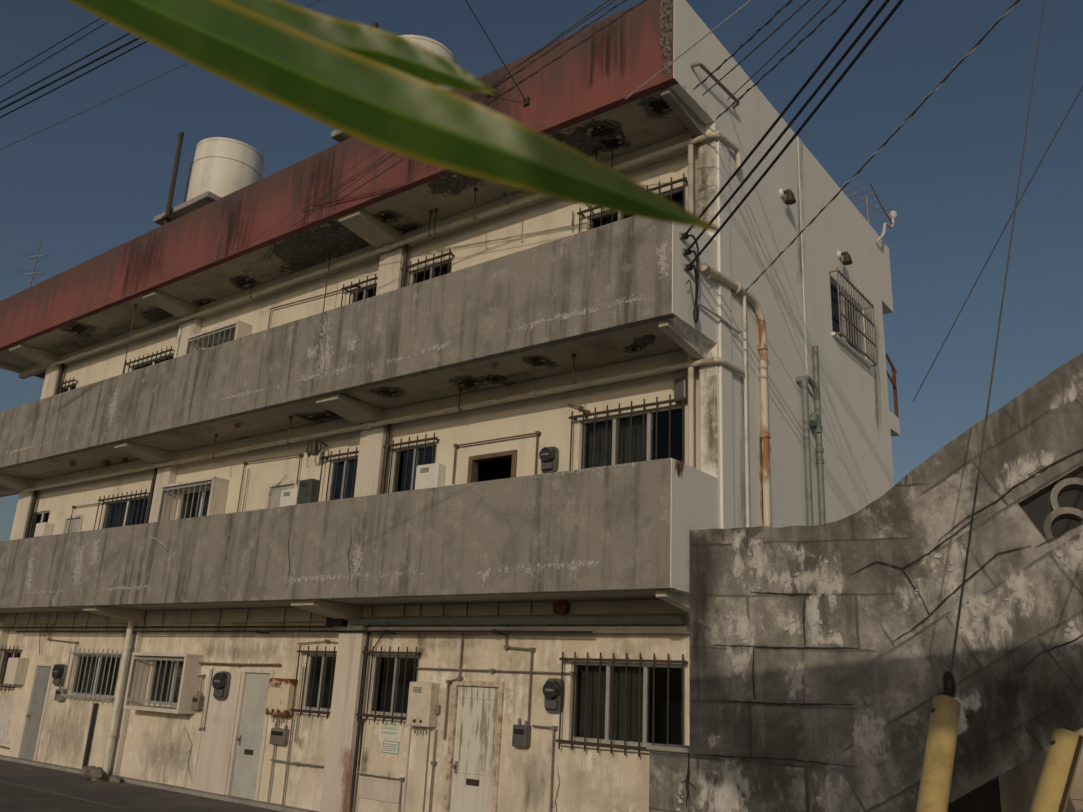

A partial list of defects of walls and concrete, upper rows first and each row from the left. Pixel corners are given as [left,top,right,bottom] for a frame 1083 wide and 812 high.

peeling [658,0,674,76]
spalling [638,94,673,119]
spalling [548,119,631,157]
peeling [425,171,485,198]
peeling [266,221,369,273]
leakage [508,294,643,332]
spalling [522,356,555,367]
spalling [447,374,507,391]
crack [850,448,1083,641]
crack [713,592,855,705]
crack [1023,634,1083,669]
leakage [955,666,1024,765]